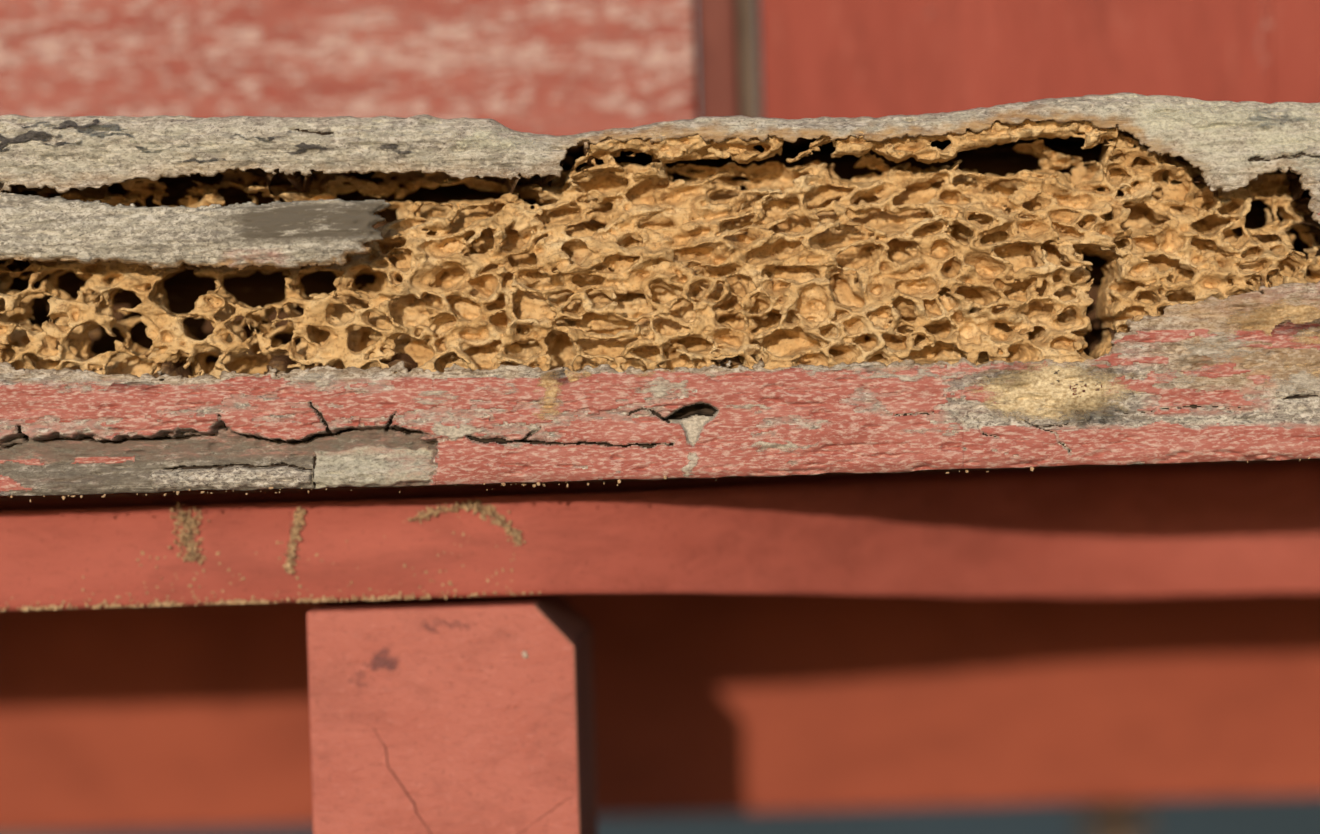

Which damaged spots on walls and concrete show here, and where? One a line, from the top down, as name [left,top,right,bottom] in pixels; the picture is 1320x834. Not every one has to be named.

peeling [0,459,45,492]
crack [0,402,419,486]
peeling [0,322,1320,485]
crack [373,728,431,834]